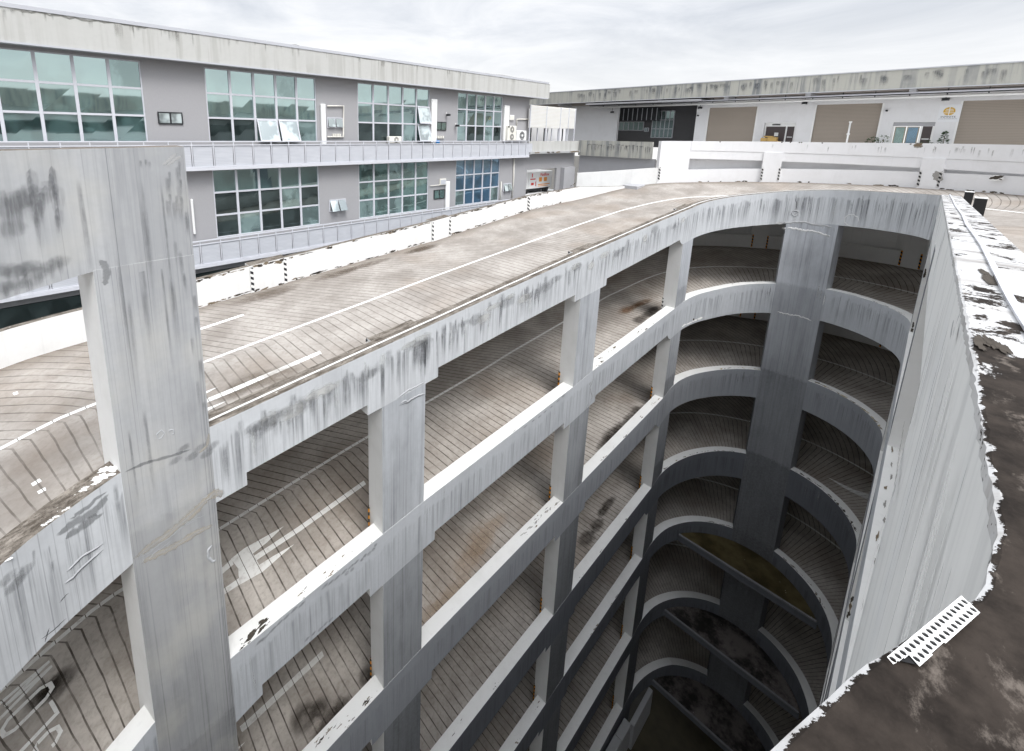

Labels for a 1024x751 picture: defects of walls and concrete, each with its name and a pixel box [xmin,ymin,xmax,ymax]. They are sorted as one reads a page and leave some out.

crack [137,490,223,563]
peeling [240,618,270,650]